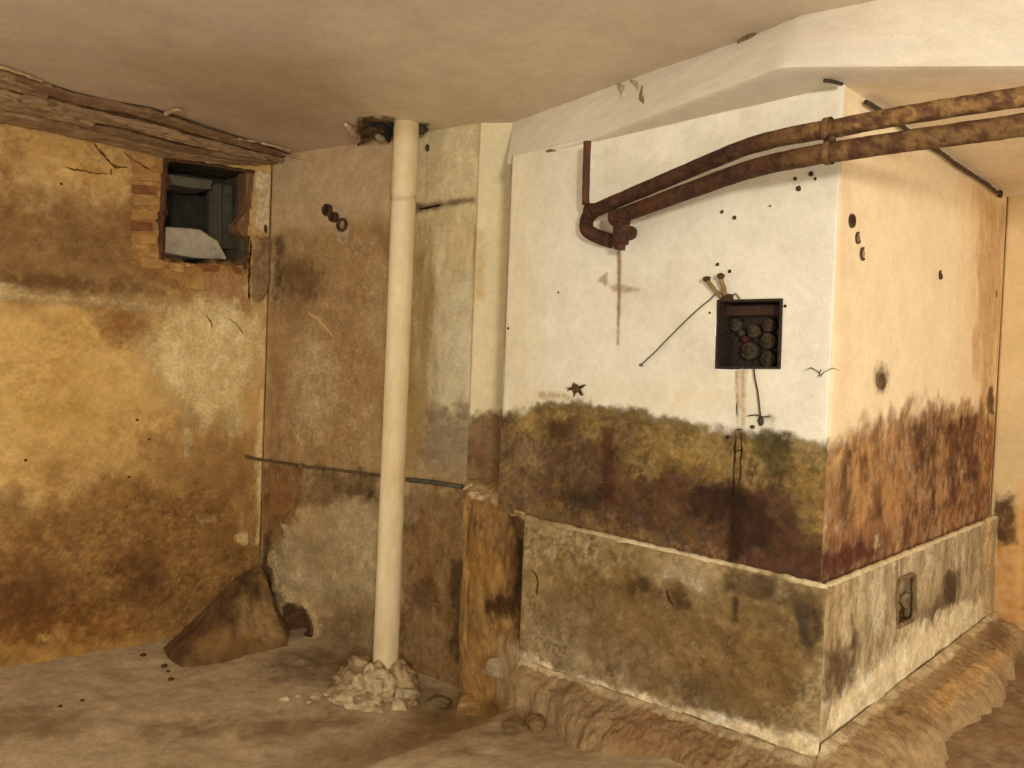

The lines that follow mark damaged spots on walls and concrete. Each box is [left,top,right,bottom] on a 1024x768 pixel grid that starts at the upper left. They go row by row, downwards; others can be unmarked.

crack [64,142,150,176]
flaking render [0,65,301,544]
corrosion [601,251,631,339]
damp [0,222,390,667]
damp [399,207,1015,756]
flaking render [269,485,380,639]
peeling [461,500,494,650]